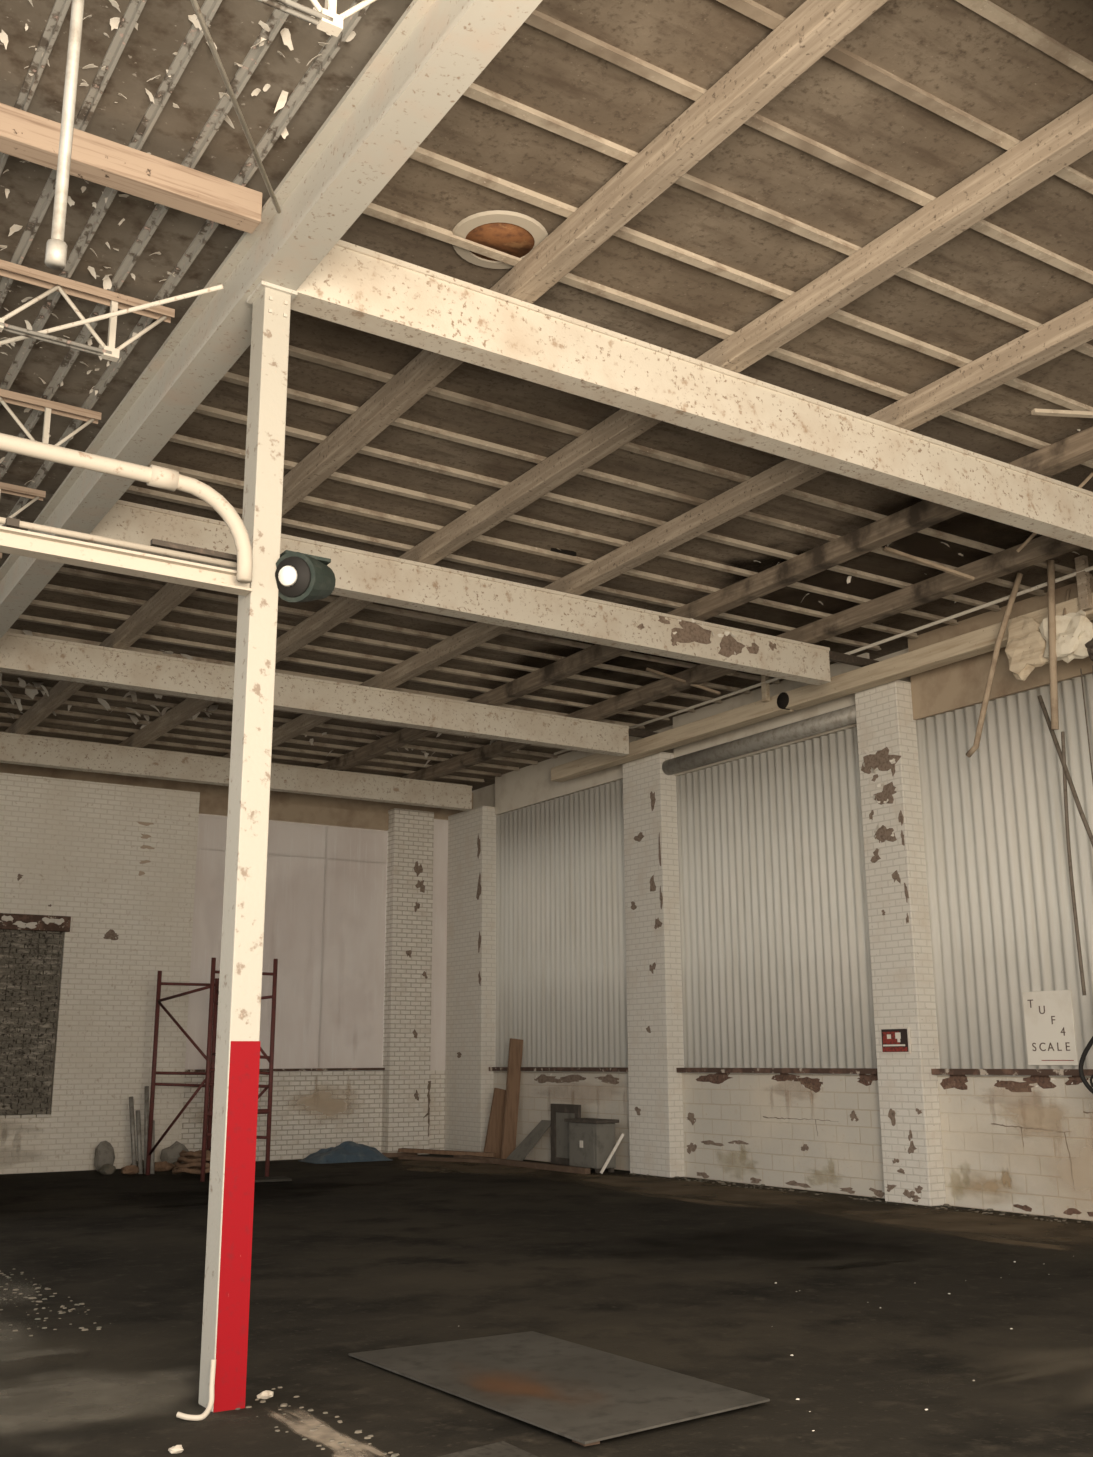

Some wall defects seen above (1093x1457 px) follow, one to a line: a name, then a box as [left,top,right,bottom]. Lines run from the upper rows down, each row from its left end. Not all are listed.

peeling [0,30,8,49]
peeling [104,0,138,37]
peeling [188,14,217,50]
peeling [251,20,294,57]
peeling [251,84,288,113]
peeling [0,224,23,251]
peeling [87,242,119,290]
peeling [637,616,777,658]
peeling [861,746,905,863]
peeling [772,1073,824,1093]
peeling [939,1075,969,1090]
peeling [994,1075,1089,1092]